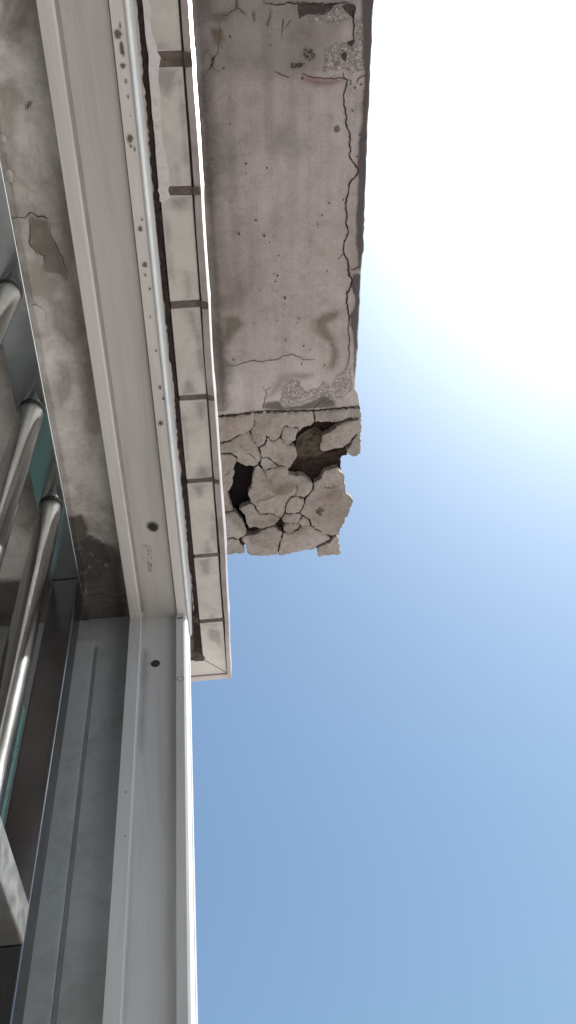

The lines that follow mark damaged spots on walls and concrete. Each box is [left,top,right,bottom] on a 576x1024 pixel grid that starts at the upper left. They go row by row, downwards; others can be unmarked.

flaking render [291,4,364,89]
crack [276,72,366,366]
crack [221,354,315,366]
flaking render [281,369,352,405]
spalling [288,420,347,483]
water stain [73,516,124,620]
water stain [0,582,20,626]